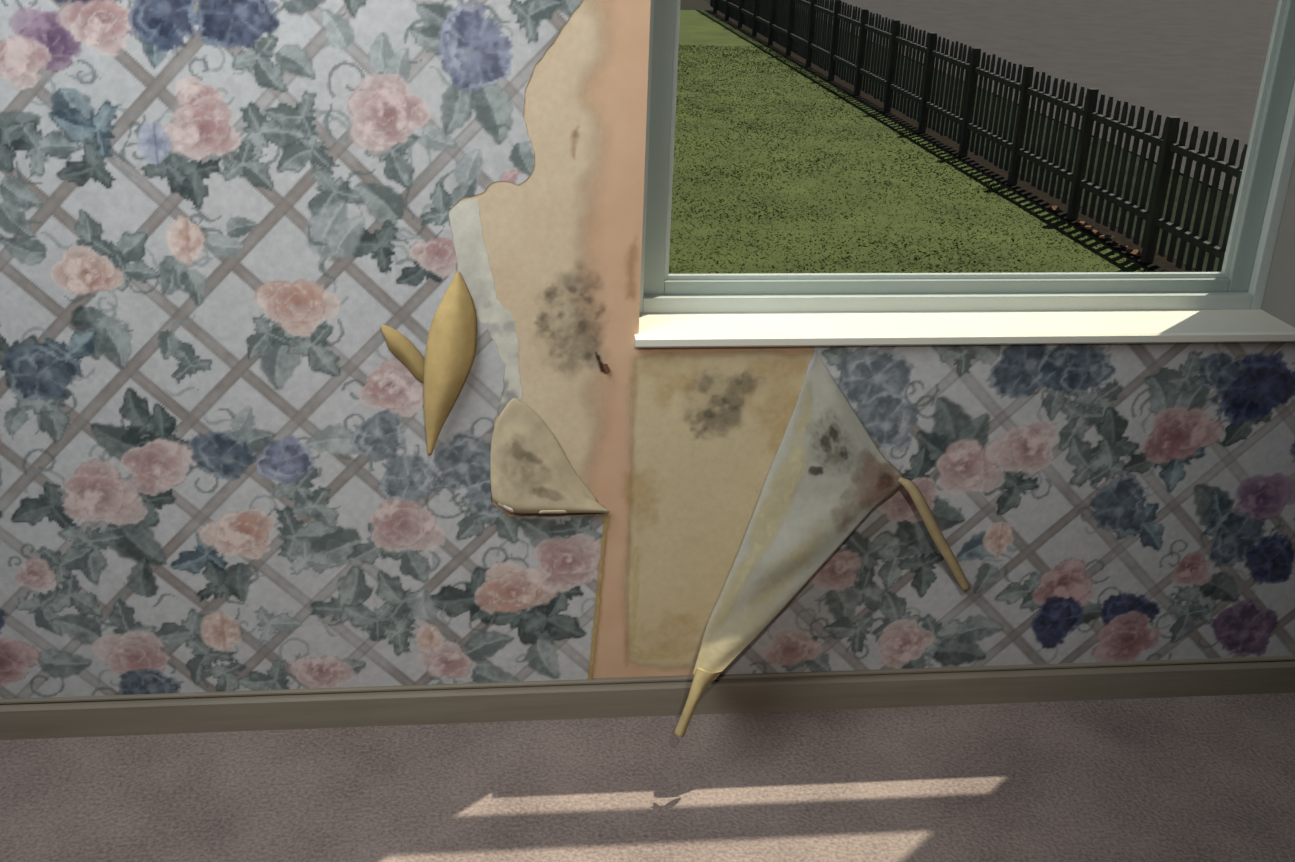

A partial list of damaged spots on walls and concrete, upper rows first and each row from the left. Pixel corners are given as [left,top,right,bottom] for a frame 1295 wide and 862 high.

peeling [449,0,610,485]
peeling [624,351,814,668]